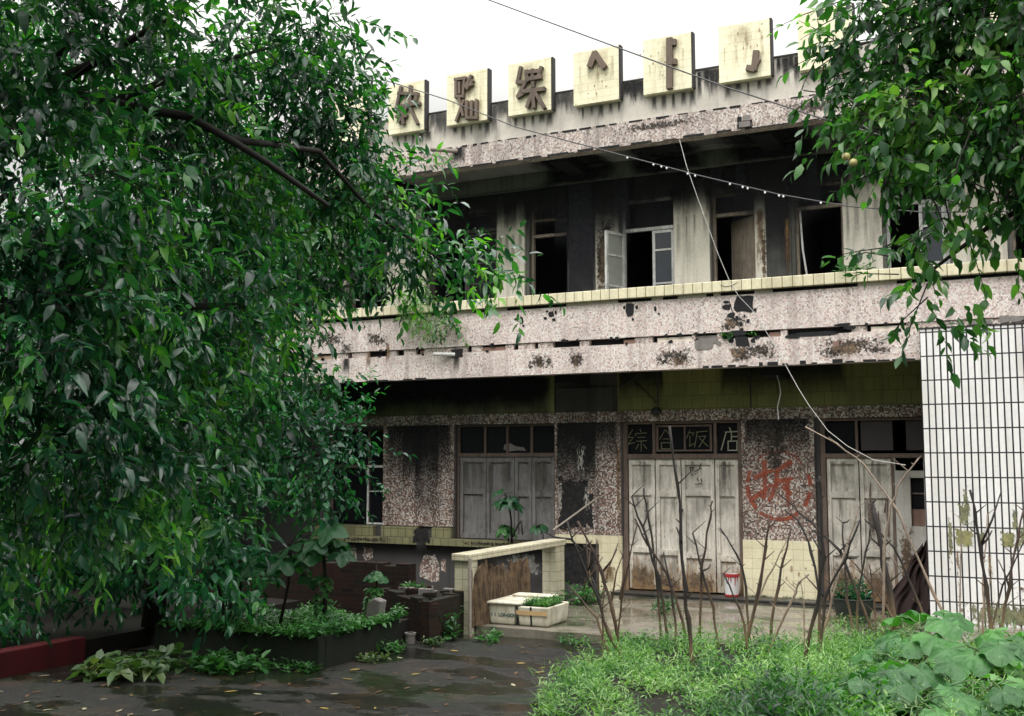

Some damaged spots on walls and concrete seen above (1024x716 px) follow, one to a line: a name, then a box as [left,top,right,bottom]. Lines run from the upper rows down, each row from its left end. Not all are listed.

water stain [397,69,770,160]
water stain [423,101,882,292]
spalling [623,303,638,321]
spalling [664,295,760,350]
water stain [341,354,553,414]
water stain [620,348,693,386]
water stain [722,334,896,385]
water stain [387,425,449,480]
water stain [536,422,616,513]
spalling [557,475,597,531]